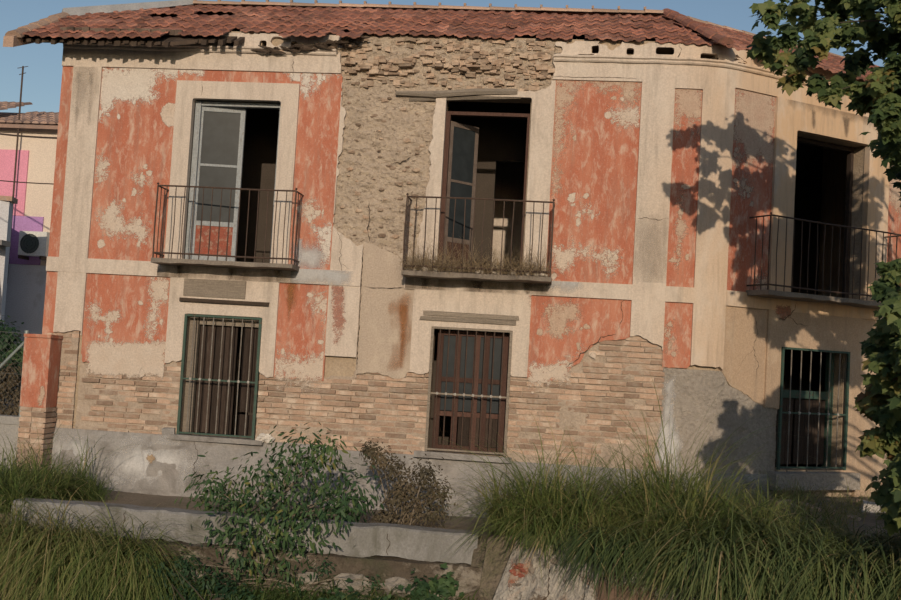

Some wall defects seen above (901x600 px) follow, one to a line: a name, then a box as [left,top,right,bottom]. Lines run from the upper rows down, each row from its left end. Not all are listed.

peeling [99,67,204,123]
spalling [283,36,641,268]
peeling [96,164,152,248]
peeling [551,236,623,280]
flaking render [255,290,429,455]
flaking render [506,300,678,471]
crack [568,301,623,366]
flaking render [508,557,547,600]